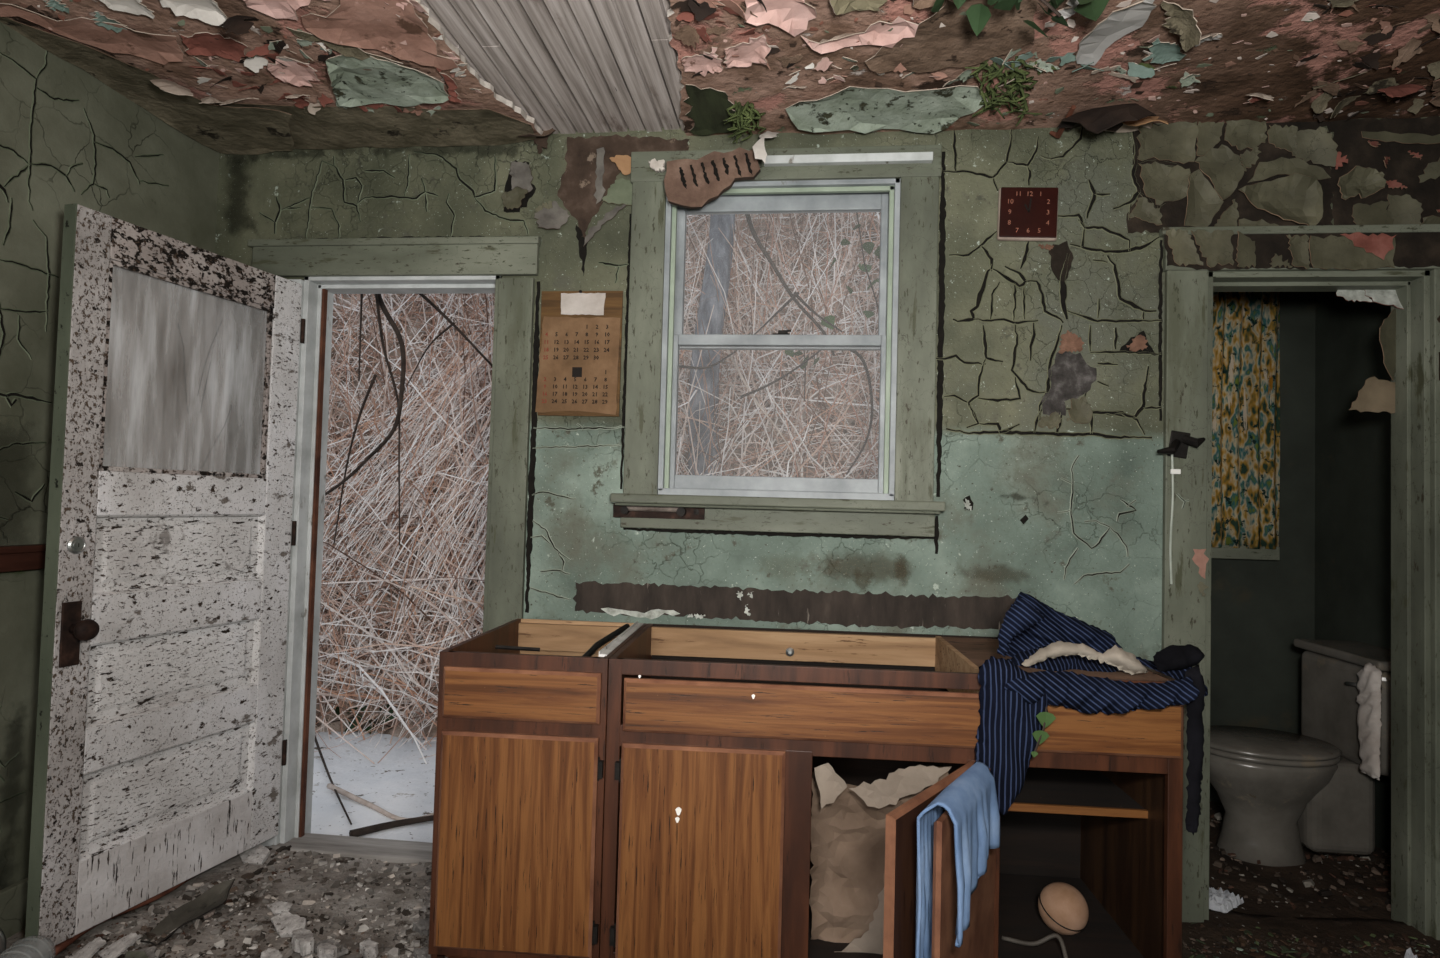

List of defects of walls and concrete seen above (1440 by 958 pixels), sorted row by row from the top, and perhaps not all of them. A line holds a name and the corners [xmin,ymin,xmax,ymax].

crack [0,50,169,360]
crack [259,151,529,239]
peeling [0,0,1440,282]
crack [0,392,51,408]
crack [623,127,1176,585]
spalling [1038,330,1097,429]
spalling [1120,331,1158,356]
peeling [1336,290,1404,414]